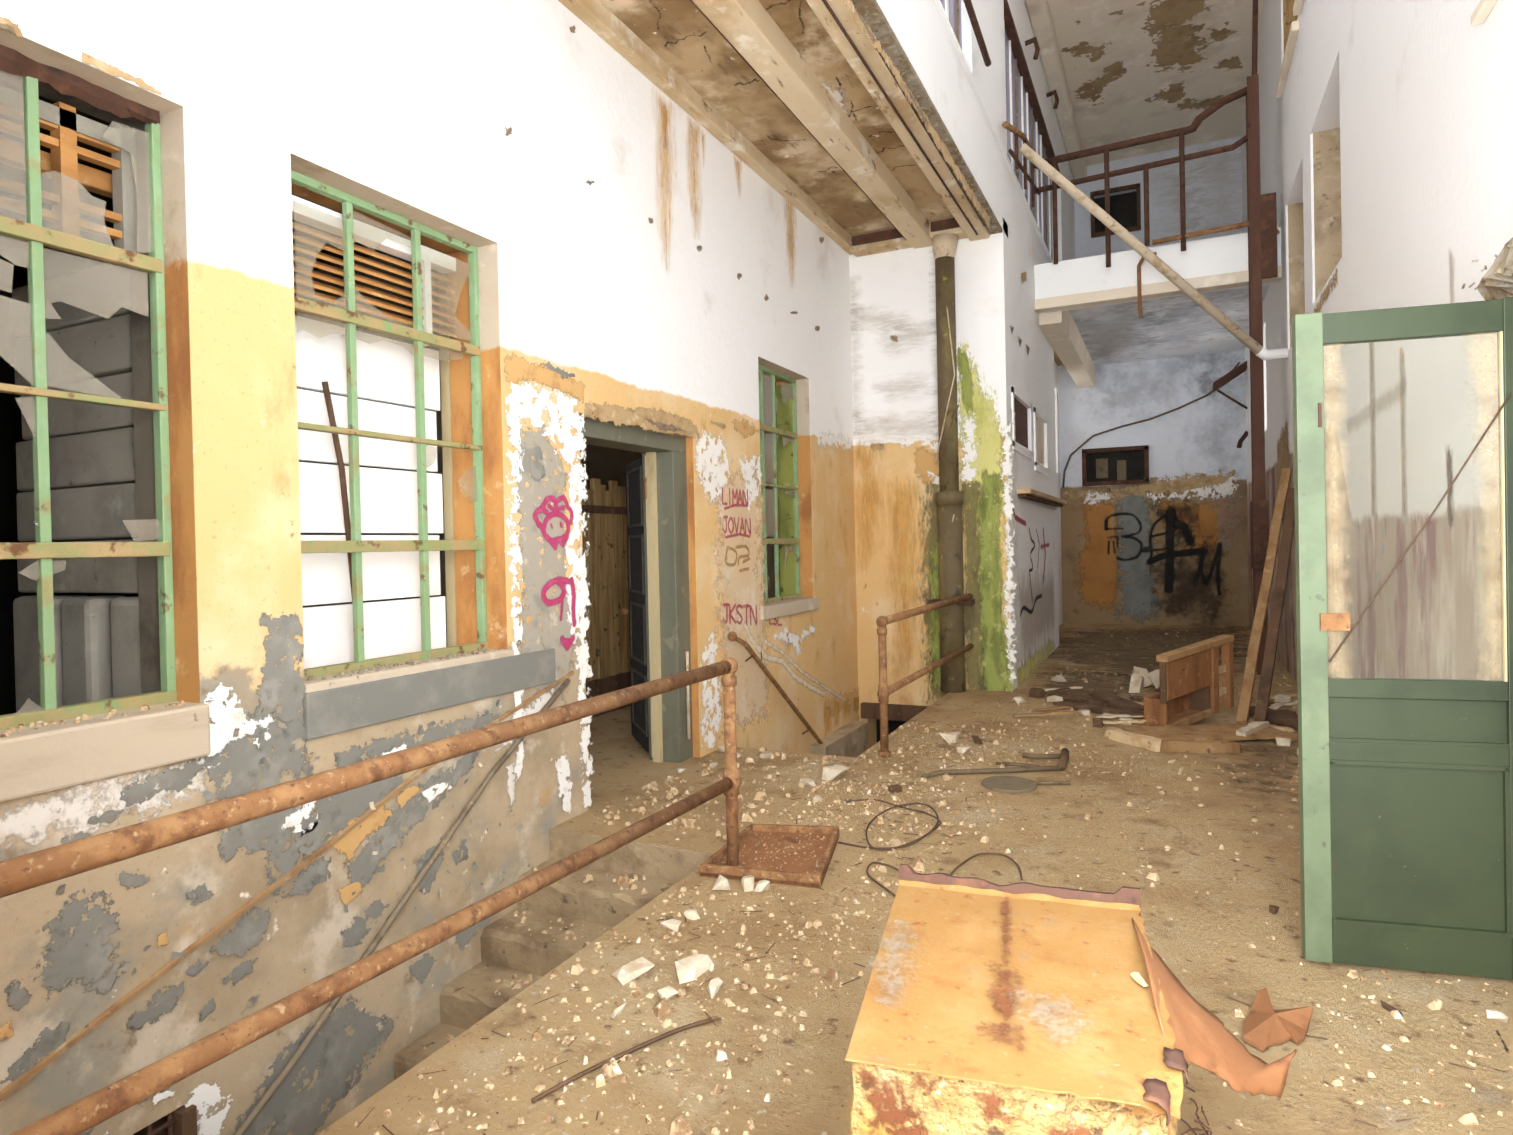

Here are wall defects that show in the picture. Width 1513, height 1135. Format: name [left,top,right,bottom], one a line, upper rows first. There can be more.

peeling [1061,41,1127,106]
peeling [1109,0,1243,110]
peeling [60,353,762,844]
flaking render [774,624,817,655]
water stain [921,475,947,702]
water stain [956,344,1251,702]
water stain [1226,739,1299,794]
peeling [0,869,150,1041]
peeling [126,751,483,1031]
peeling [456,917,490,950]
peeling [0,1021,70,1084]
peeling [138,994,398,1135]